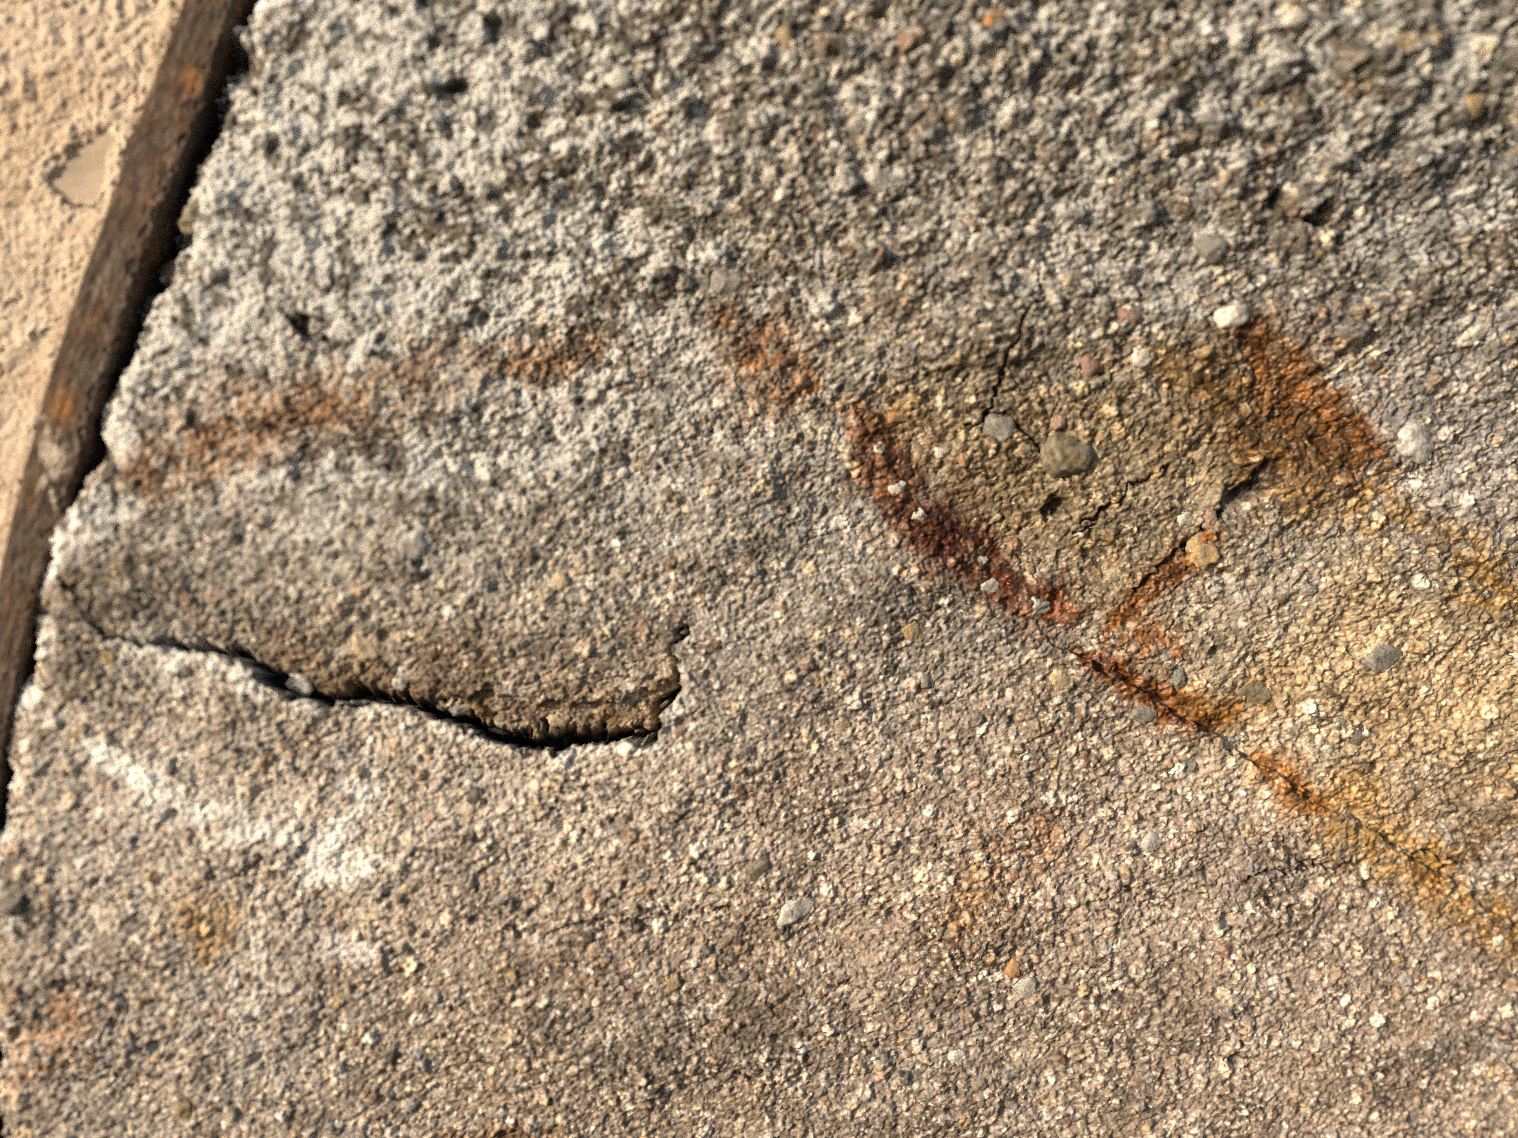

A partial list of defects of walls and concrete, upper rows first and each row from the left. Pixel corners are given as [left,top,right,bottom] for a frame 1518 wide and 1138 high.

crack [986,265,1046,412]
crack [152,615,699,771]
rust [694,290,1518,977]
rust [152,872,273,977]
rust [0,972,121,1104]